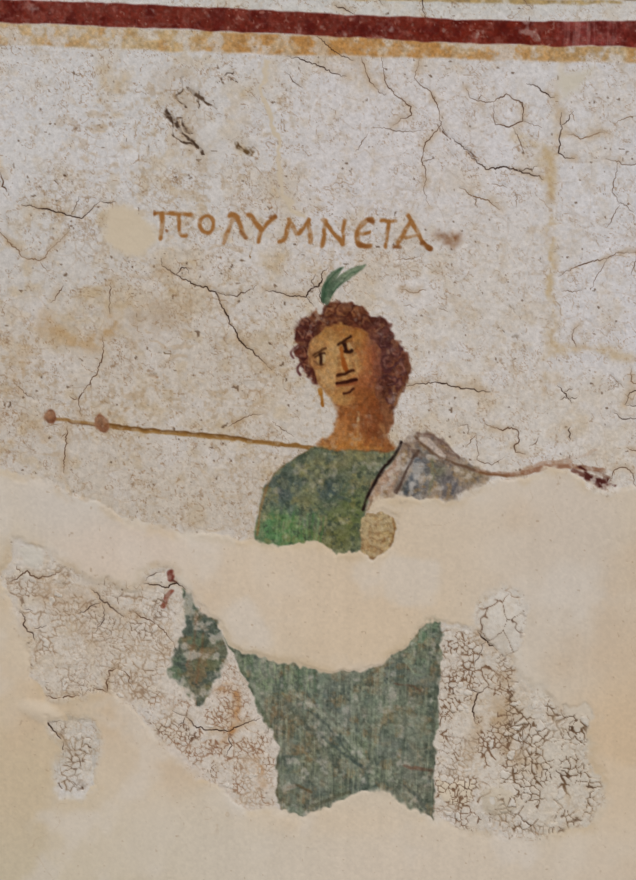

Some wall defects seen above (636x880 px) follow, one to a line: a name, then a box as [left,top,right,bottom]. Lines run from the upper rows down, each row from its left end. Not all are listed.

crack [285,36,636,210]
crack [0,171,116,303]
crack [160,258,328,371]
crack [401,289,426,308]
crack [559,251,636,293]
crack [606,158,636,228]
crack [61,336,105,473]
spalling [575,464,618,492]
crack [1,562,277,810]
crack [431,593,605,838]